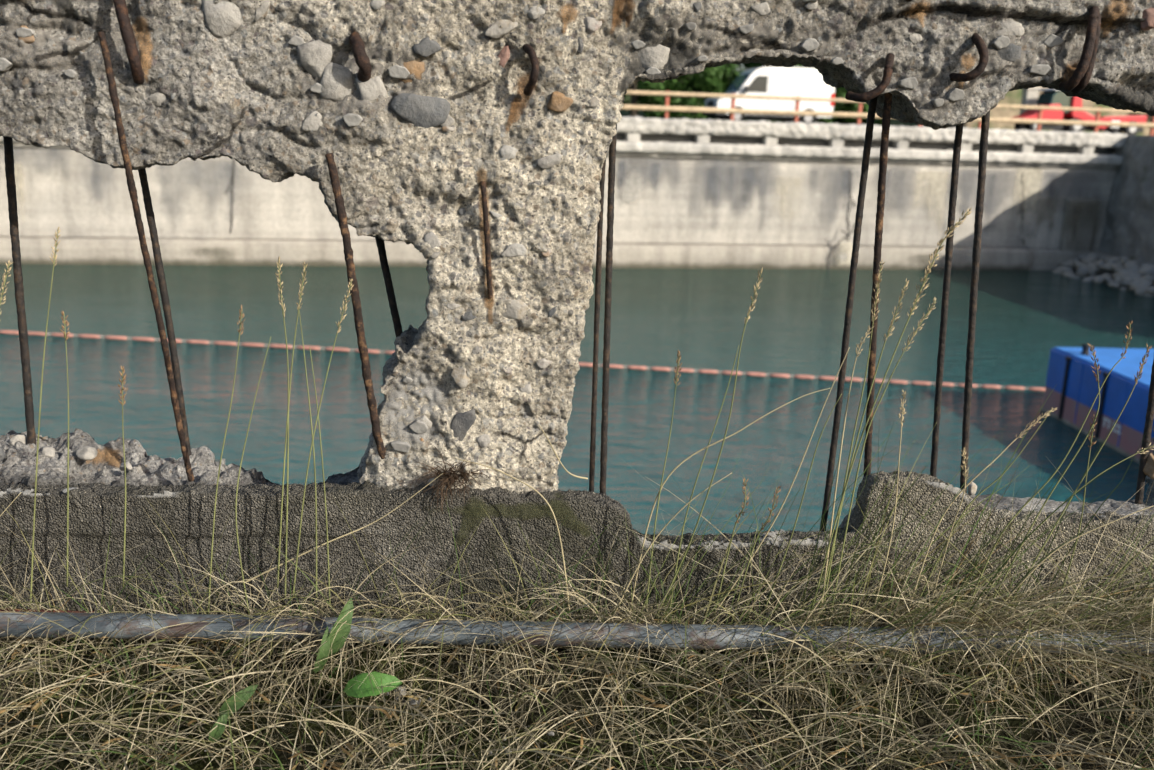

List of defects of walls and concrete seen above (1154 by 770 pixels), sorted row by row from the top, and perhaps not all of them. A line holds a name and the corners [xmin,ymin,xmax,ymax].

rust [134,18,152,81]
rust [506,74,536,131]
rust [610,0,635,34]
spalling [625,18,719,76]
rust [959,54,974,87]
spalling [0,0,194,482]
spalling [325,153,446,459]
rust [478,169,494,324]
spalling [589,124,617,495]
spalling [640,6,1101,551]
crack [496,431,563,461]
spalling [1134,359,1154,504]